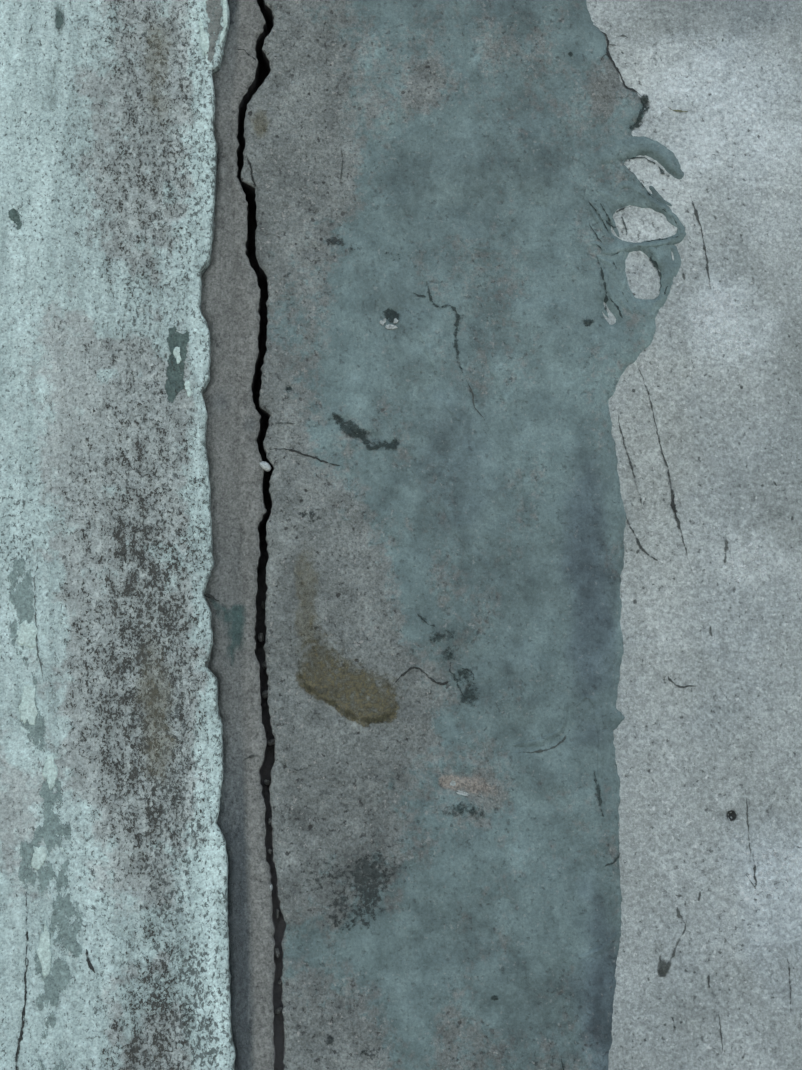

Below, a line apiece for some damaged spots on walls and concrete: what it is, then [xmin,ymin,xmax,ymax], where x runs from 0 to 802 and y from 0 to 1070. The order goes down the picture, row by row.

spalling [629,95,649,130]
spalling [379,309,399,330]
spalling [329,413,399,450]
crack [236,0,343,1070]
leakage [296,622,399,727]
spalling [417,614,478,706]
spalling [439,776,488,818]
crack [15,866,29,1070]